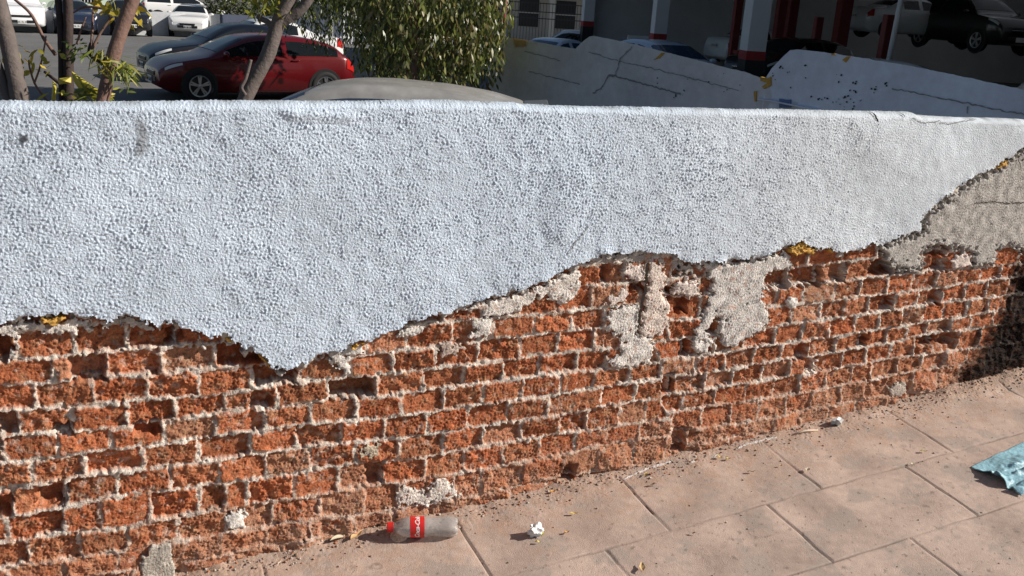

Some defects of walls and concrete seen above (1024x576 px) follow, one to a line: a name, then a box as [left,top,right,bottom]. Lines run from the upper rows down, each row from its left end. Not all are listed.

crack [524,47,738,95]
flaking render [0,148,1024,576]